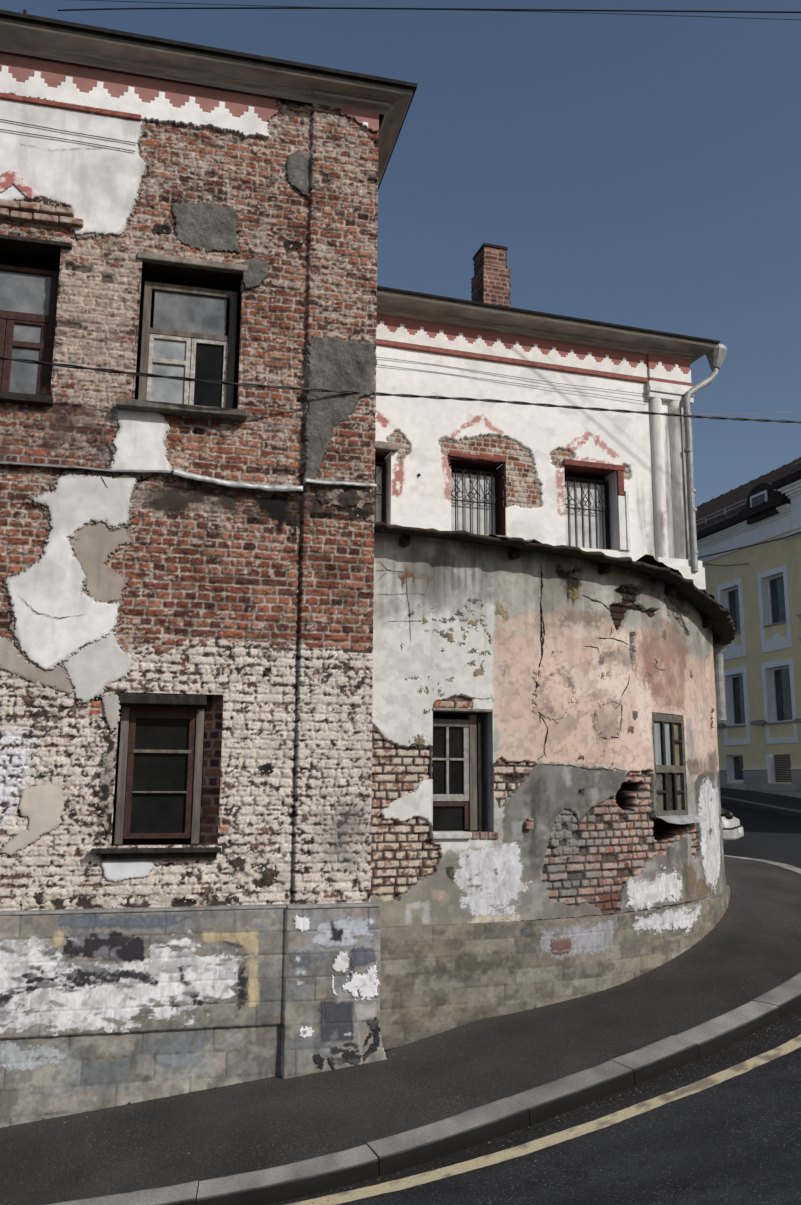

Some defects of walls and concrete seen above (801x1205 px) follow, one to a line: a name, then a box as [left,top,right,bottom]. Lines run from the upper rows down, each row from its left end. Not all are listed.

flaking render [0,99,149,240]
spalling [153,224,172,234]
spalling [285,239,304,250]
flaking render [438,435,542,509]
flaking render [549,448,575,469]
peeling [0,402,279,1074]
flaking render [405,676,475,716]
crack [536,558,628,771]
crack [594,660,663,739]
flaking render [609,586,688,668]
flaking render [370,725,721,960]
peeling [289,915,380,1065]